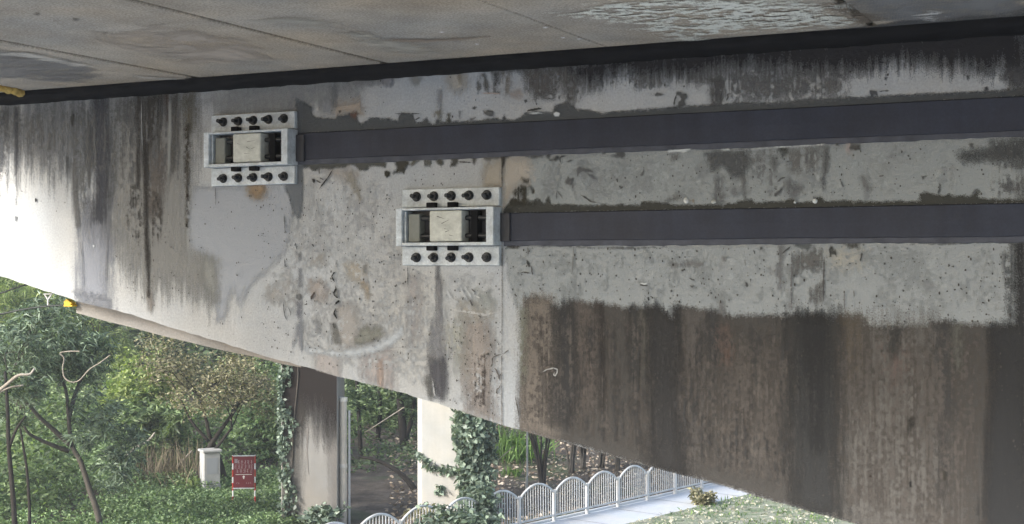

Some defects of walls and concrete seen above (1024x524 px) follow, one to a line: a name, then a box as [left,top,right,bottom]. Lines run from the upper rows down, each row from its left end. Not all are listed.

water stain [0,78,394,332]
water stain [433,35,1024,122]
water stain [261,242,1024,524]